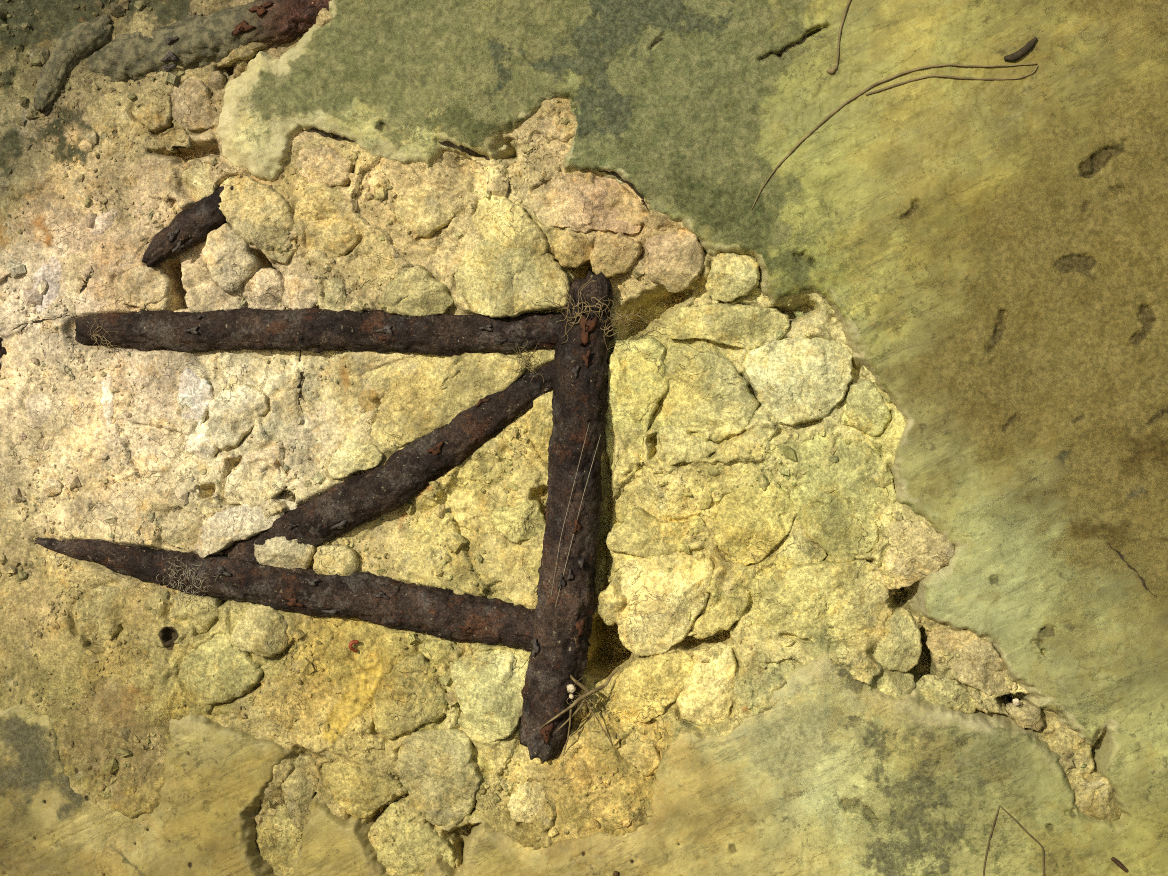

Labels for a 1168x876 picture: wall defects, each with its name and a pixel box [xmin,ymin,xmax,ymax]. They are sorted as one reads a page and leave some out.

spalling [67,0,179,48]
rust [34,0,332,115]
crack [760,27,827,60]
peeling [158,127,195,154]
rust [142,186,234,267]
spalling [676,422,712,442]
rust [35,271,617,763]
spalling [254,390,554,609]
spalling [426,659,455,693]
spalling [445,642,531,667]
spalling [963,684,1121,822]
spalling [361,786,428,825]